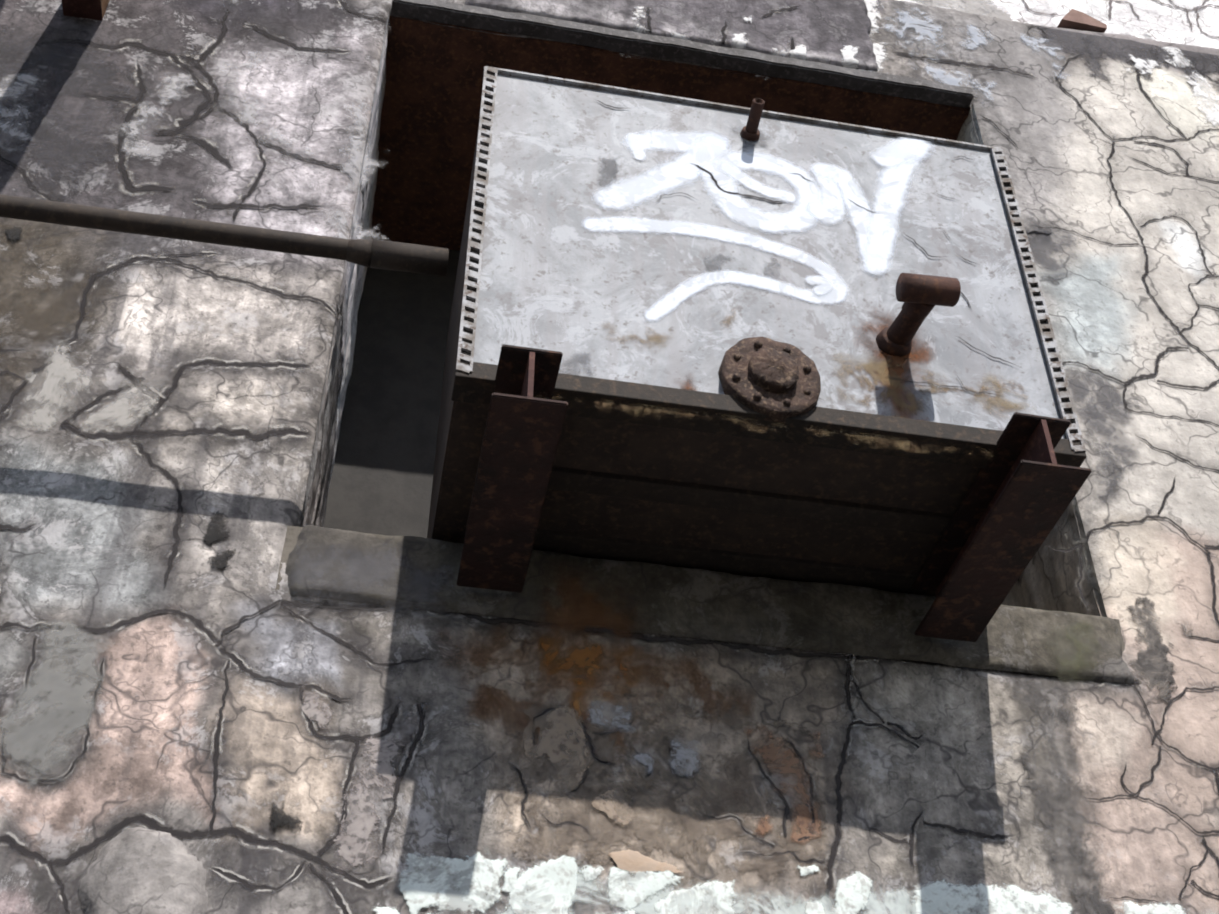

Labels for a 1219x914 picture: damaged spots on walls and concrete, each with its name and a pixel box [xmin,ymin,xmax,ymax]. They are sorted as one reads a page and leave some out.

crack [762,6,799,56]
crack [1022,0,1062,40]
crack [1108,0,1219,38]
crack [38,9,369,221]
crack [0,251,343,421]
corrosion [842,339,948,418]
crack [895,52,1219,642]
spalling [301,691,332,729]
crack [0,357,1219,914]
corrosion [634,655,749,717]
spalling [332,736,409,868]
spalling [374,679,1184,914]